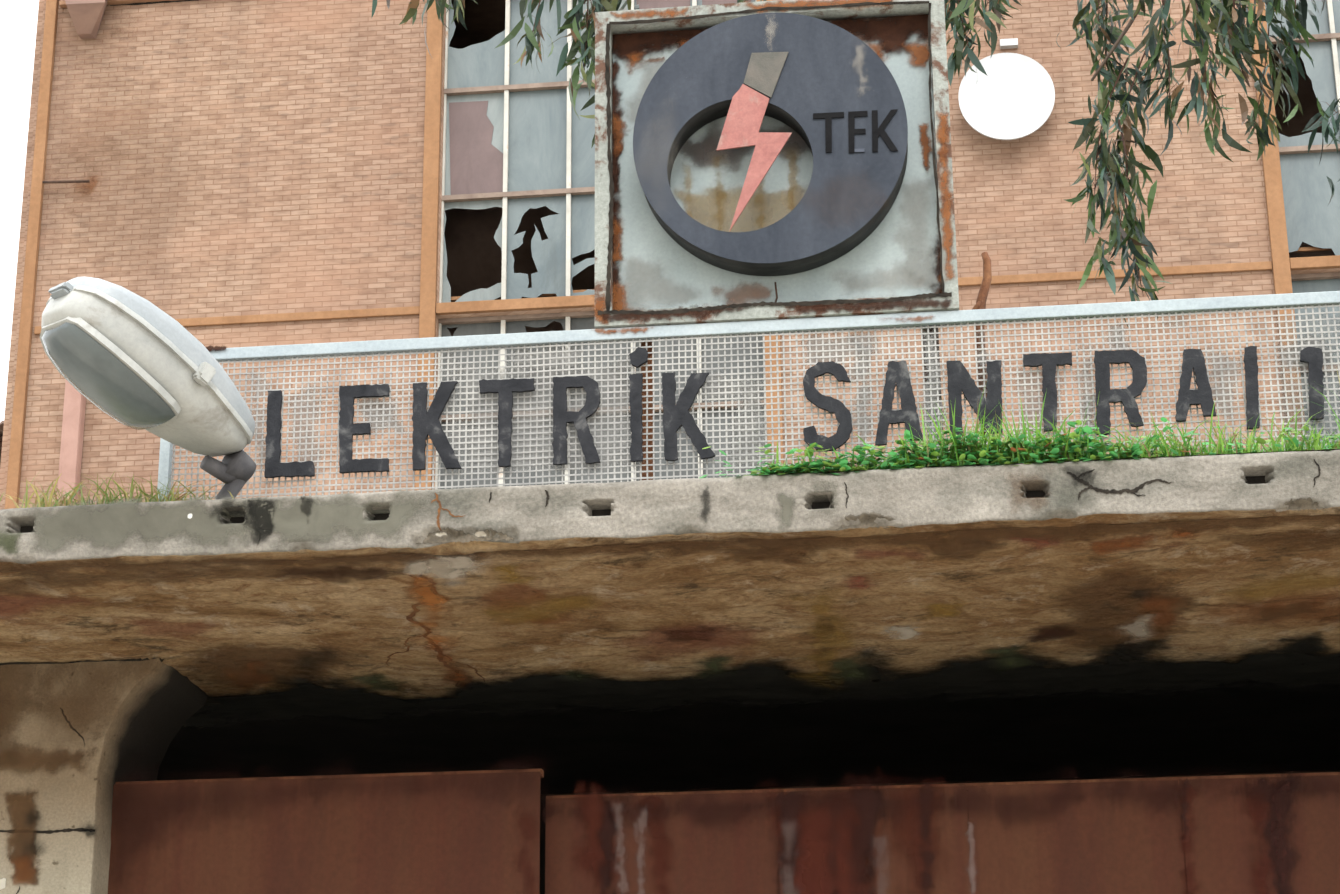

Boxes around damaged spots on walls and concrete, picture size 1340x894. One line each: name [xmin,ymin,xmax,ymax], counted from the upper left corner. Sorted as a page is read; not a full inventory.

damp [0,493,1340,575]
damp [701,487,709,518]
crack [1067,469,1172,500]
damp [193,648,338,689]
crack [386,571,485,687]
corrosion [0,751,84,773]
crack [60,707,85,747]
corrosion [5,792,38,885]
corrosion [576,795,616,894]
corrosion [774,786,884,894]